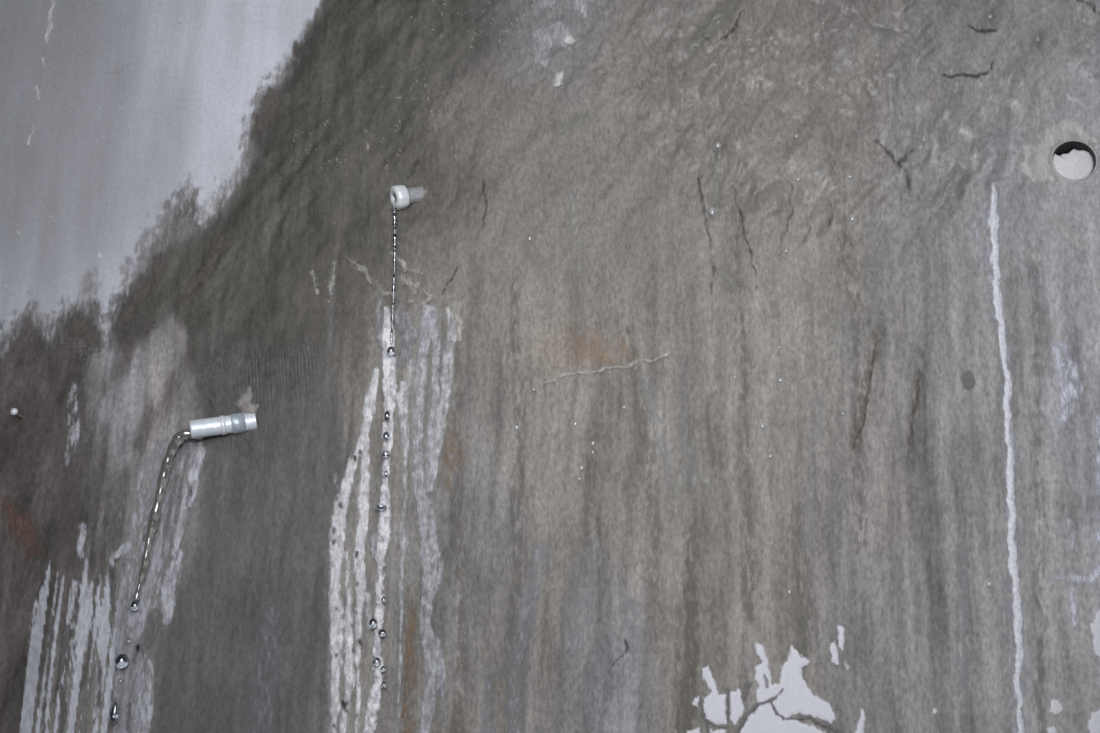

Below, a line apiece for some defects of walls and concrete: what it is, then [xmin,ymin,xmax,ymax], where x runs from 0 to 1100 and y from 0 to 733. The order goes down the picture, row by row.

peeling [533,21,579,87]
damp [32,631,49,733]
damp [47,614,64,733]
damp [57,681,67,733]
damp [62,643,76,733]
damp [74,626,109,733]
damp [107,665,118,733]
peeling [687,643,835,733]
peeling [830,625,849,670]
peeling [855,709,866,733]
peeling [1087,709,1100,733]
peeling [1090,610,1100,658]